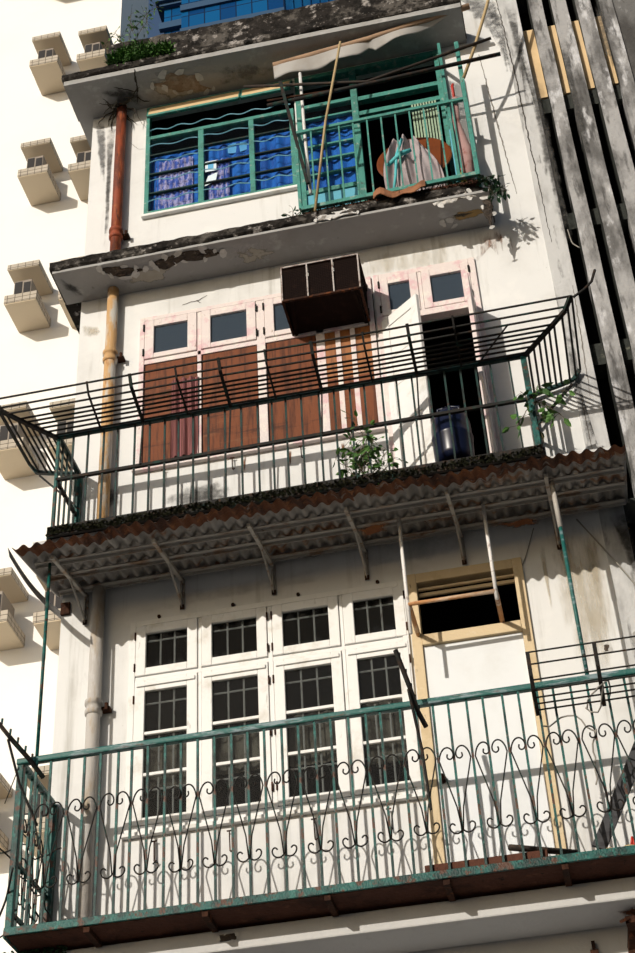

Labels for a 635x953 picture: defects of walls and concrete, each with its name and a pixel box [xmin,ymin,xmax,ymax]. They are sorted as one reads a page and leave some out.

spalling [150,69,215,99]
leakage [463,0,566,215]
leakage [97,128,113,229]
spalling [433,188,497,229]
spalling [96,245,227,283]
leakage [179,485,223,504]